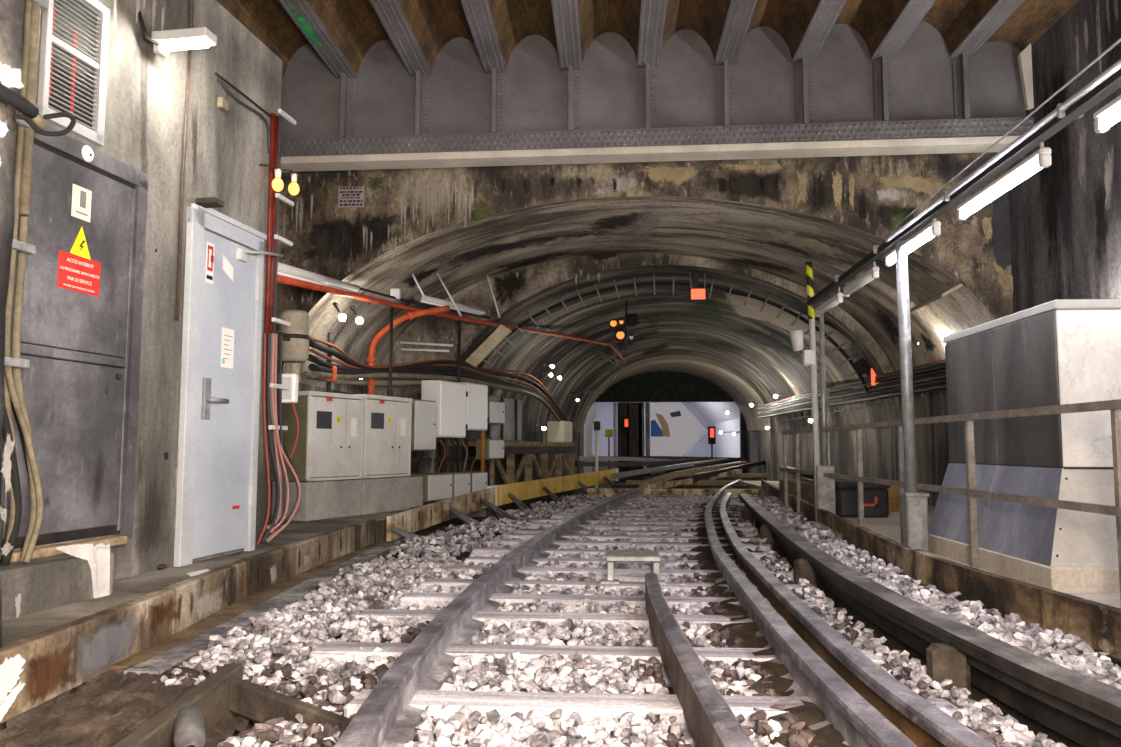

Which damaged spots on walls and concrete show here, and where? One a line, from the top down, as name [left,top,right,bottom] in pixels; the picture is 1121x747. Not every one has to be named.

damp [1075,0,1118,74]
flaking render [0,61,24,89]
damp [1040,73,1067,119]
flaking render [0,120,9,138]
damp [279,176,474,259]
damp [502,174,637,201]
damp [719,170,915,228]
damp [1039,127,1121,263]
peeling [56,543,110,598]
corrosion [140,593,194,636]
peeling [0,654,26,721]
corrosion [27,644,72,704]